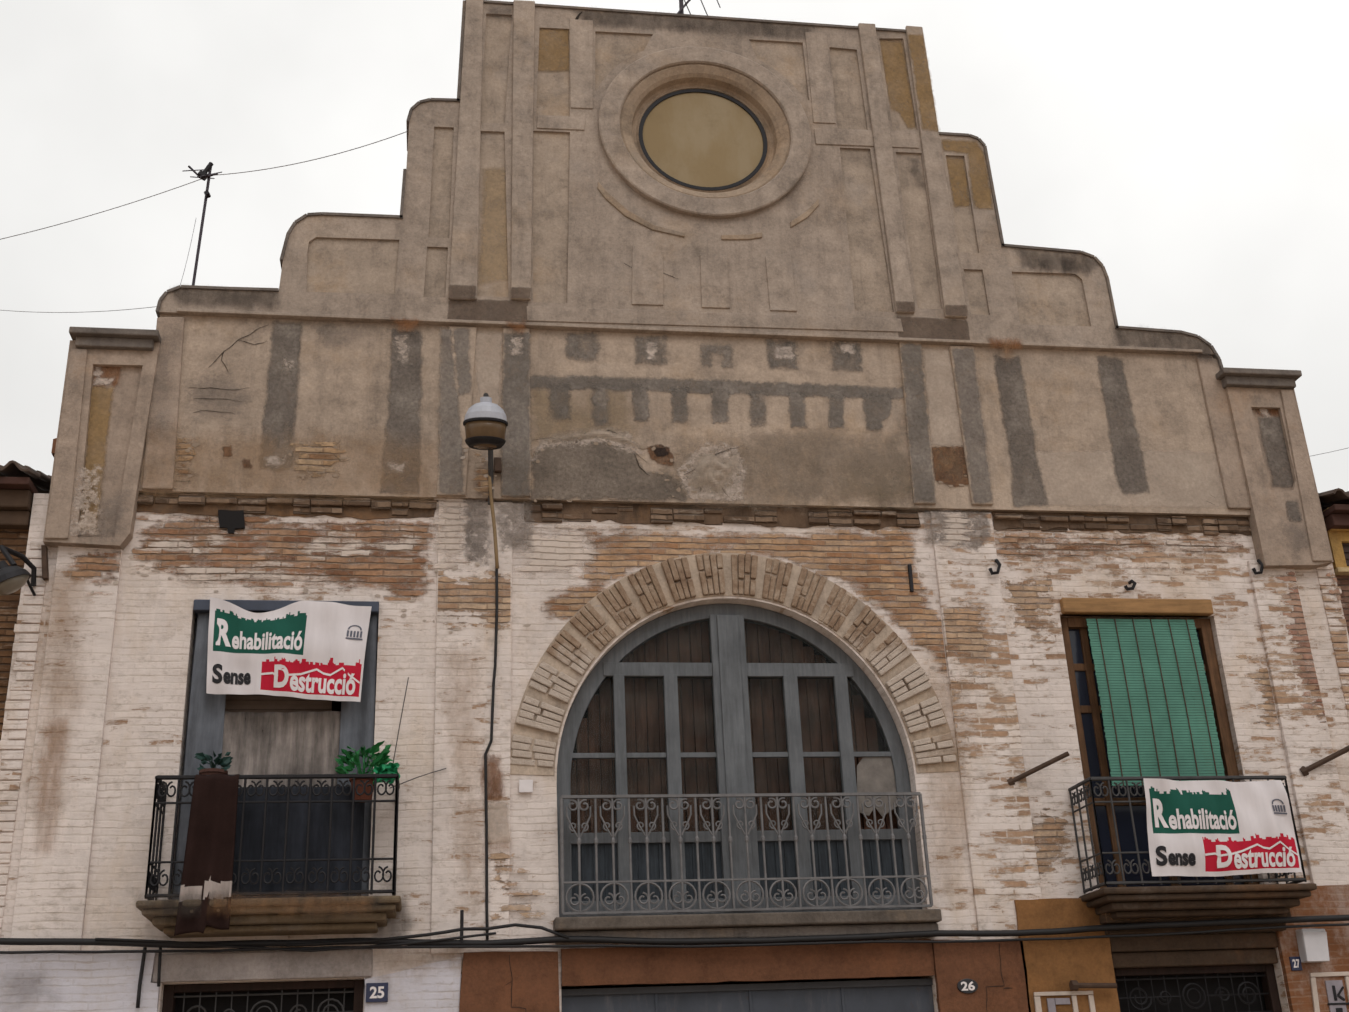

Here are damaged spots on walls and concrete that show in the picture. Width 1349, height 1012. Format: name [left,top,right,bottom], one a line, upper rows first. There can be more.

crack [189,325,267,414]
flaking render [267,441,346,479]
flaking render [607,434,747,503]
peeling [62,445,997,684]
peeling [1275,572,1326,730]
peeling [1236,655,1278,729]
peeling [1032,808,1072,879]
peeling [481,852,545,921]